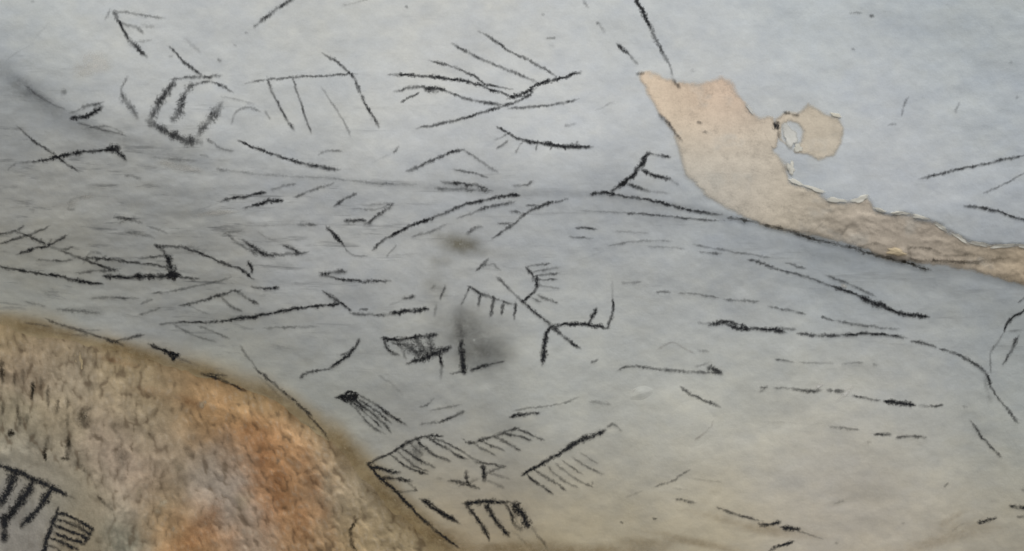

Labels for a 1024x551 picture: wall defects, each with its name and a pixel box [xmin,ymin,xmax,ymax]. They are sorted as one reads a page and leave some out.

spalling [640,71,1024,284]